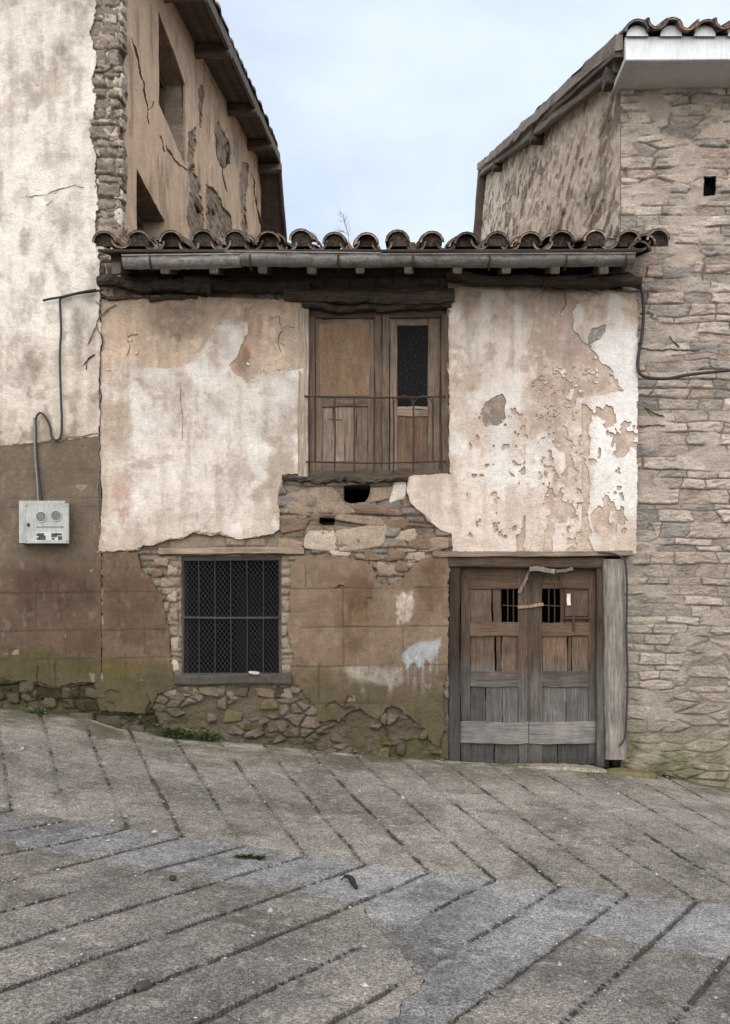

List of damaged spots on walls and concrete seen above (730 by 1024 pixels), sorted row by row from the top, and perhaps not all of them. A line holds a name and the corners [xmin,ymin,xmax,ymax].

crack [131,38,188,171]
crack [22,185,84,206]
spalling [186,85,248,239]
flaking render [100,302,299,390]
flaking render [478,394,509,427]
flaking render [527,290,623,551]
spalling [277,481,452,585]
spalling [0,552,447,761]
leakage [404,642,440,666]